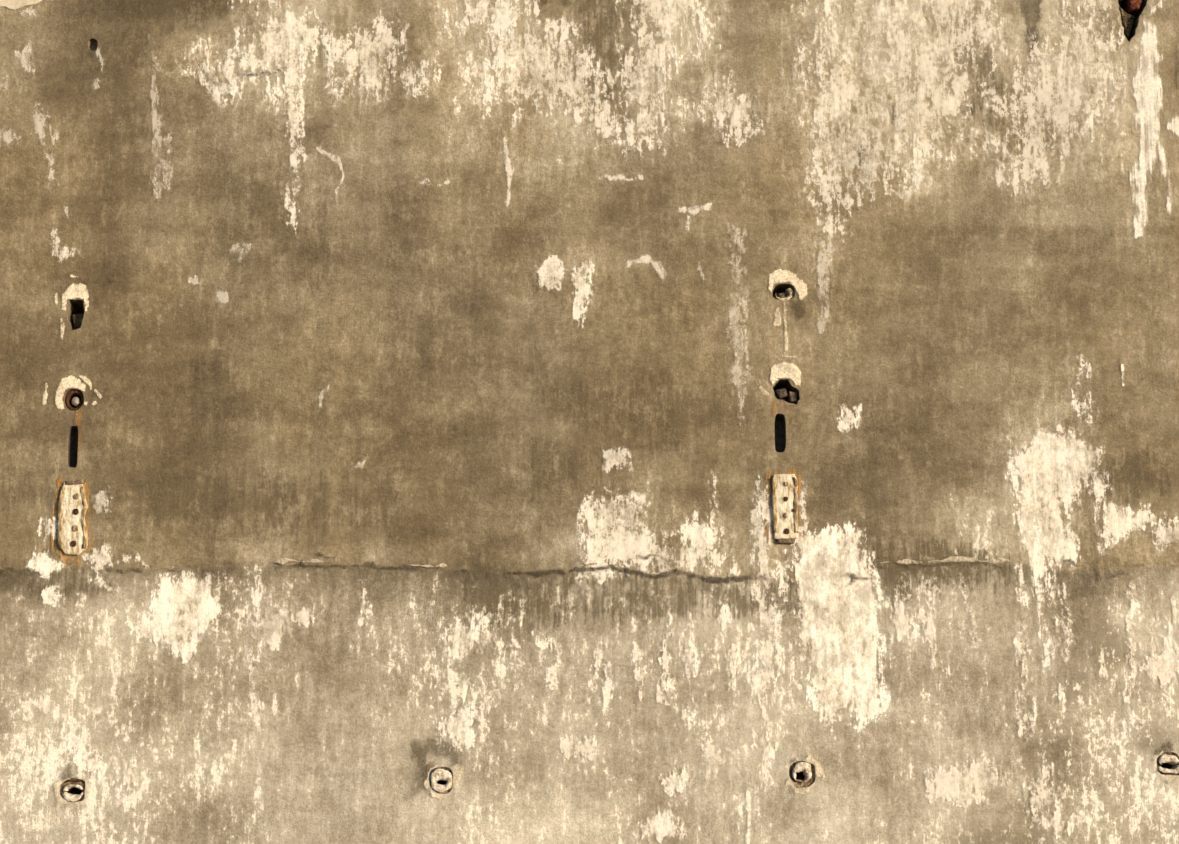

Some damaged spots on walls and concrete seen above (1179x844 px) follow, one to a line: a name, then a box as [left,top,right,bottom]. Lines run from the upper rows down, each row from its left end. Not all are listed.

peeling [183,0,429,230]
peeling [443,0,764,158]
peeling [794,0,1148,235]
peeling [504,137,514,205]
peeling [679,203,712,231]
crack [280,552,467,572]
crack [506,554,766,584]
crack [846,562,988,585]
peeling [1005,356,1179,739]
peeling [575,448,935,844]
peeling [559,733,598,763]
peeling [924,754,1089,839]